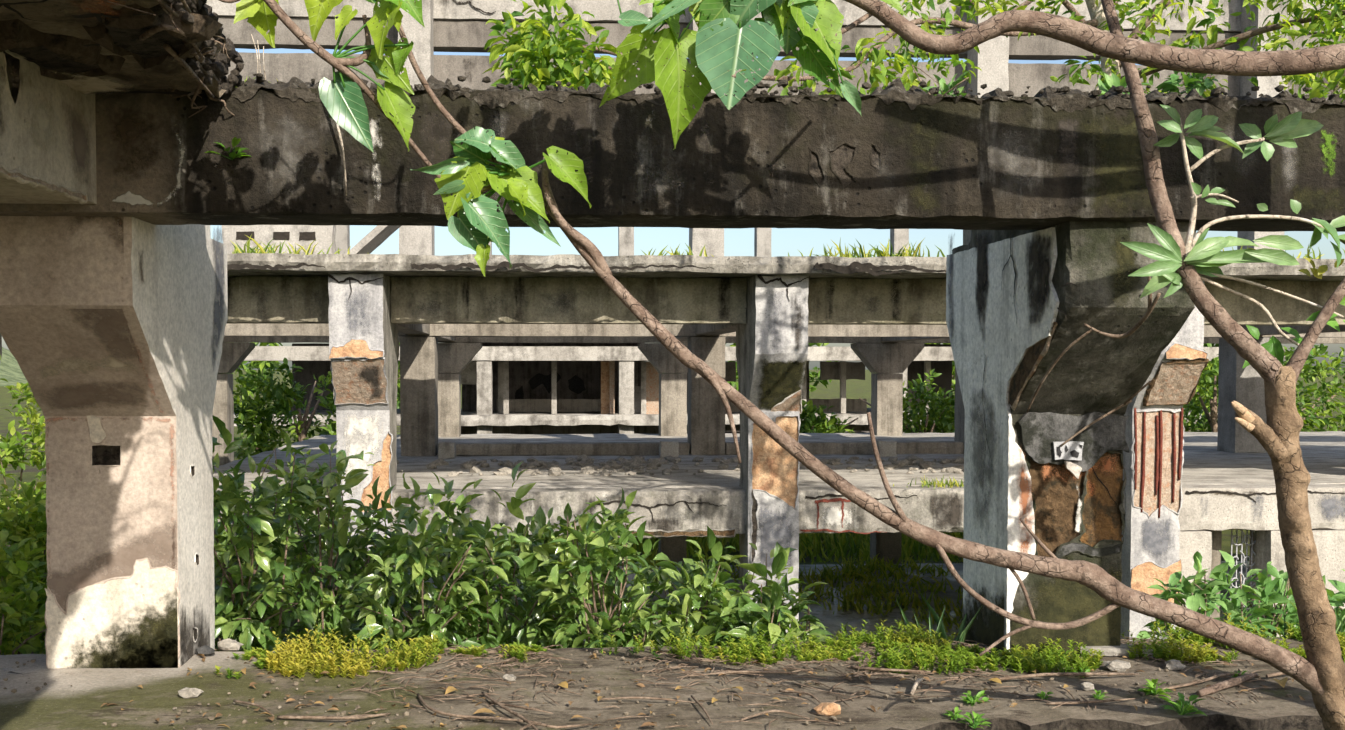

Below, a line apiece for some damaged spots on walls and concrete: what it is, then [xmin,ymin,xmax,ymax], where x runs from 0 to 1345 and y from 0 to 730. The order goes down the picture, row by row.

spalling [0,0,245,107]
damp [975,235,988,333]
damp [1026,235,1051,323]
spalling [329,338,388,405]
spalling [1008,322,1058,411]
spalling [360,430,393,512]
crack [596,500,727,520]
spalling [617,390,802,564]
spalling [1028,342,1209,559]
spalling [1130,559,1182,603]